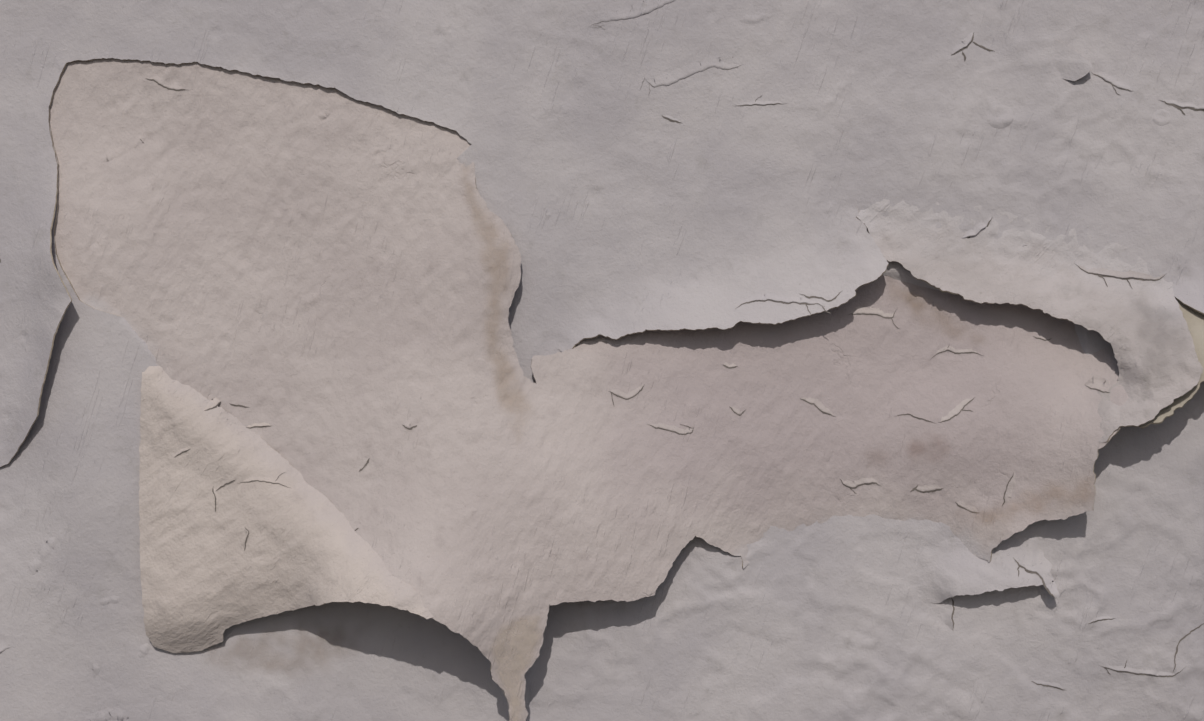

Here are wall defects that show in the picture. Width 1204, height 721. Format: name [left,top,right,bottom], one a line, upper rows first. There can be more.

crack [591,0,675,28]
crack [640,56,741,123]
crack [951,33,993,60]
peeling [1049,38,1093,81]
crack [1094,72,1133,95]
crack [1160,100,1204,115]
peeling [0,59,72,467]
peeling [557,200,889,352]
peeling [856,199,1204,443]
peeling [139,366,434,653]
peeling [901,533,1052,603]
crack [1099,623,1204,677]